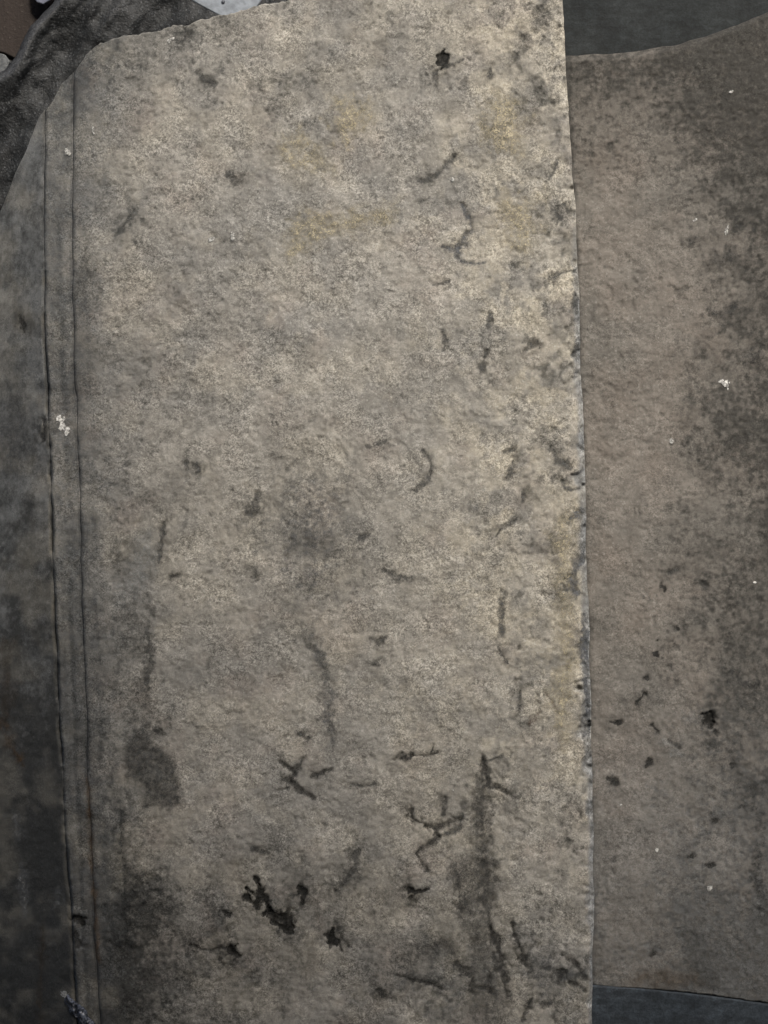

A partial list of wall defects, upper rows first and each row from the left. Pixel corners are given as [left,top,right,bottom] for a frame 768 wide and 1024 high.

spalling [430,48,464,87]
crack [432,204,485,286]
crack [414,449,432,493]
leakage [126,724,180,808]
crack [279,760,332,800]
crack [406,797,462,873]
leakage [452,759,496,959]